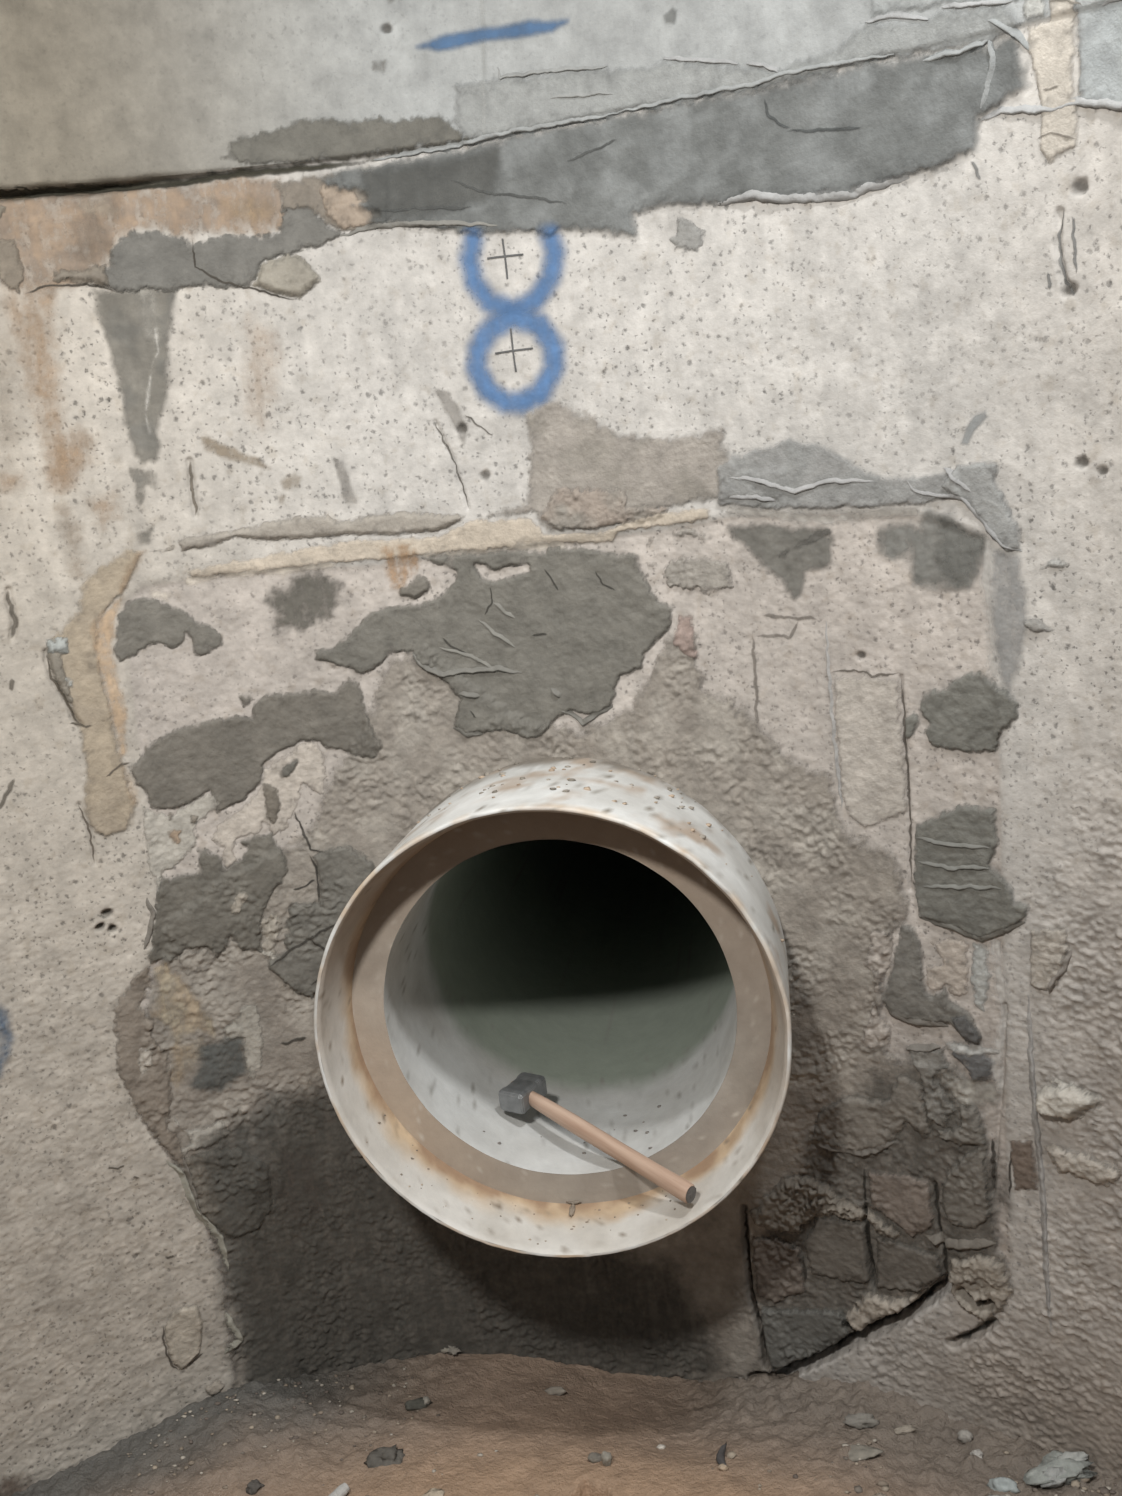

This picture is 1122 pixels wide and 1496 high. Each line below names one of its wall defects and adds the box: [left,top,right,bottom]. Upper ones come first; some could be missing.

peeling [617,54,894,133]
crack [0,163,348,199]
peeling [320,184,466,230]
spalling [458,182,560,203]
peeling [0,239,24,293]
peeling [253,254,321,299]
spalling [231,893,249,913]
spalling [261,914,282,959]
spalling [179,948,215,976]
crack [863,1173,876,1272]
crack [935,1182,948,1272]
crack [745,1210,767,1352]